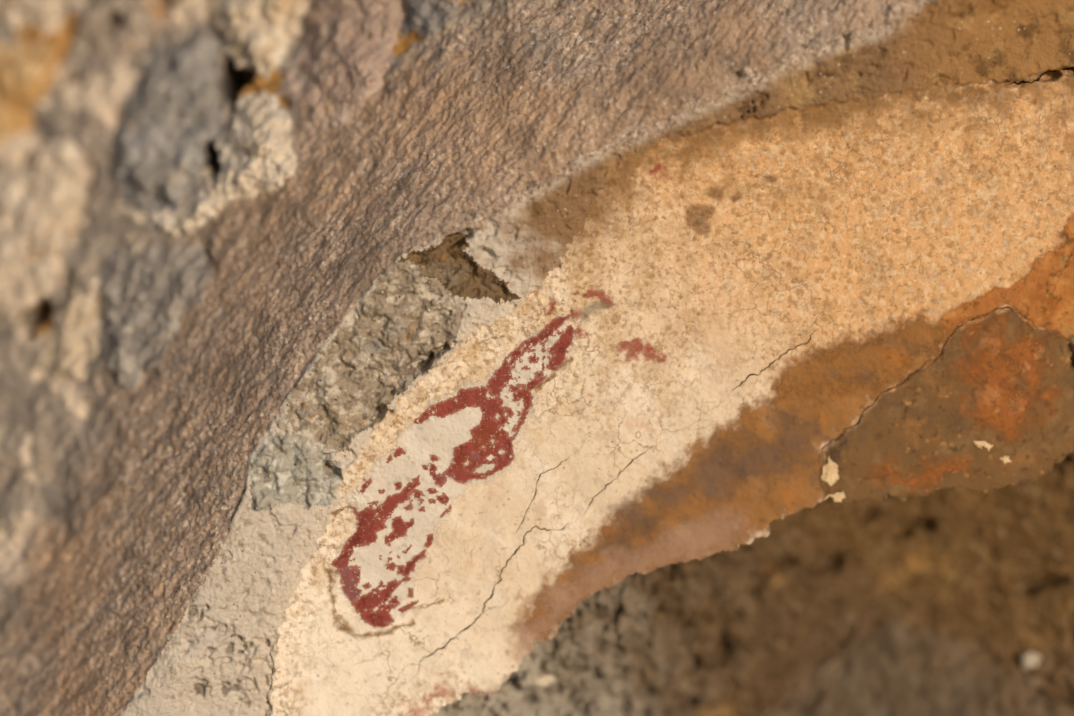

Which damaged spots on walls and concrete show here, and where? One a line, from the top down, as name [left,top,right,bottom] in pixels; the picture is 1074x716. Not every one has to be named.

crack [1004,26,1074,86]
peeling [247,232,575,637]
crack [362,319,834,709]
peeling [821,456,846,502]
crack [818,307,1059,459]
peeling [974,441,1011,463]